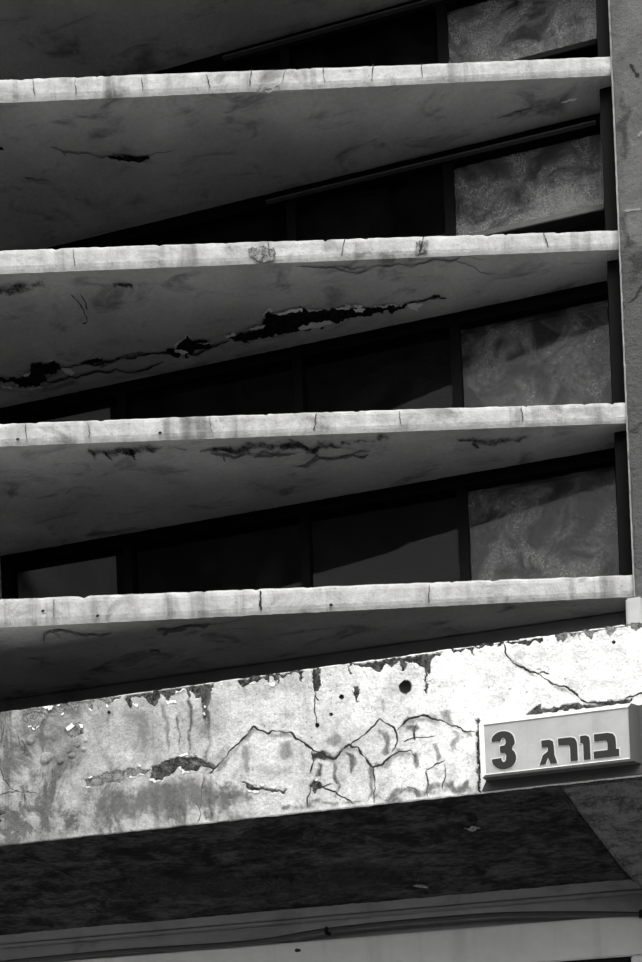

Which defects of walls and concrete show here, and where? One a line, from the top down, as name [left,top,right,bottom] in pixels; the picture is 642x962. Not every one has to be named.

crack [51,147,108,159]
crack [296,236,493,274]
spalling [224,303,423,343]
spalling [160,334,212,359]
spalling [0,352,143,390]
crack [209,417,369,468]
peeling [238,667,323,691]
crack [503,642,642,705]
damp [162,690,211,746]
crack [191,668,474,821]
spalling [85,753,215,788]